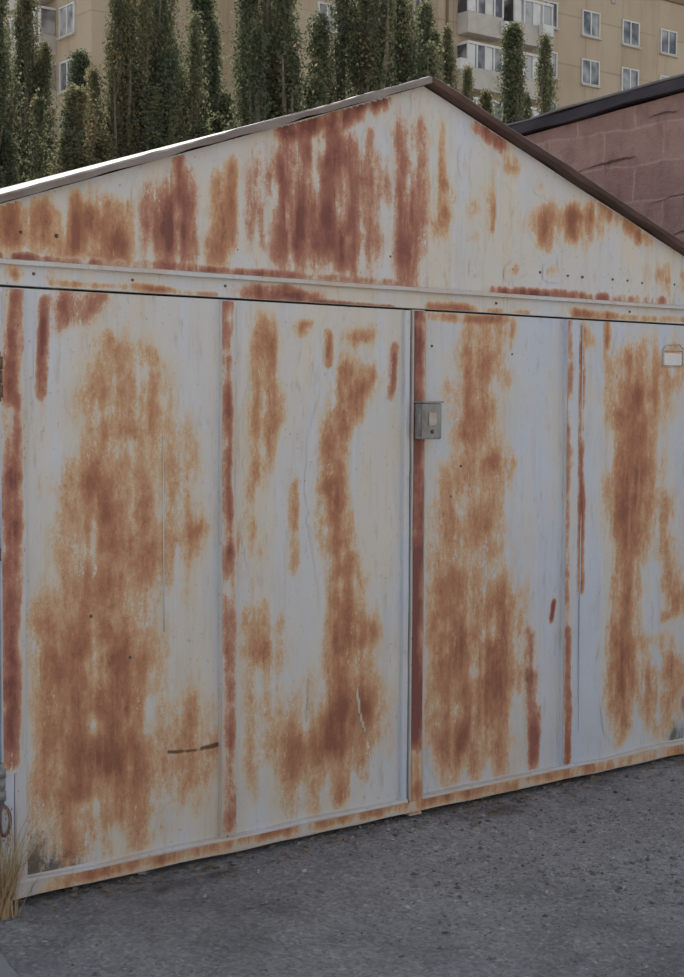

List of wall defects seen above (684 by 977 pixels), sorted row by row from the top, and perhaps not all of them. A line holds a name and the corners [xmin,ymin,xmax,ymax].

corrosion [0,87,684,765]